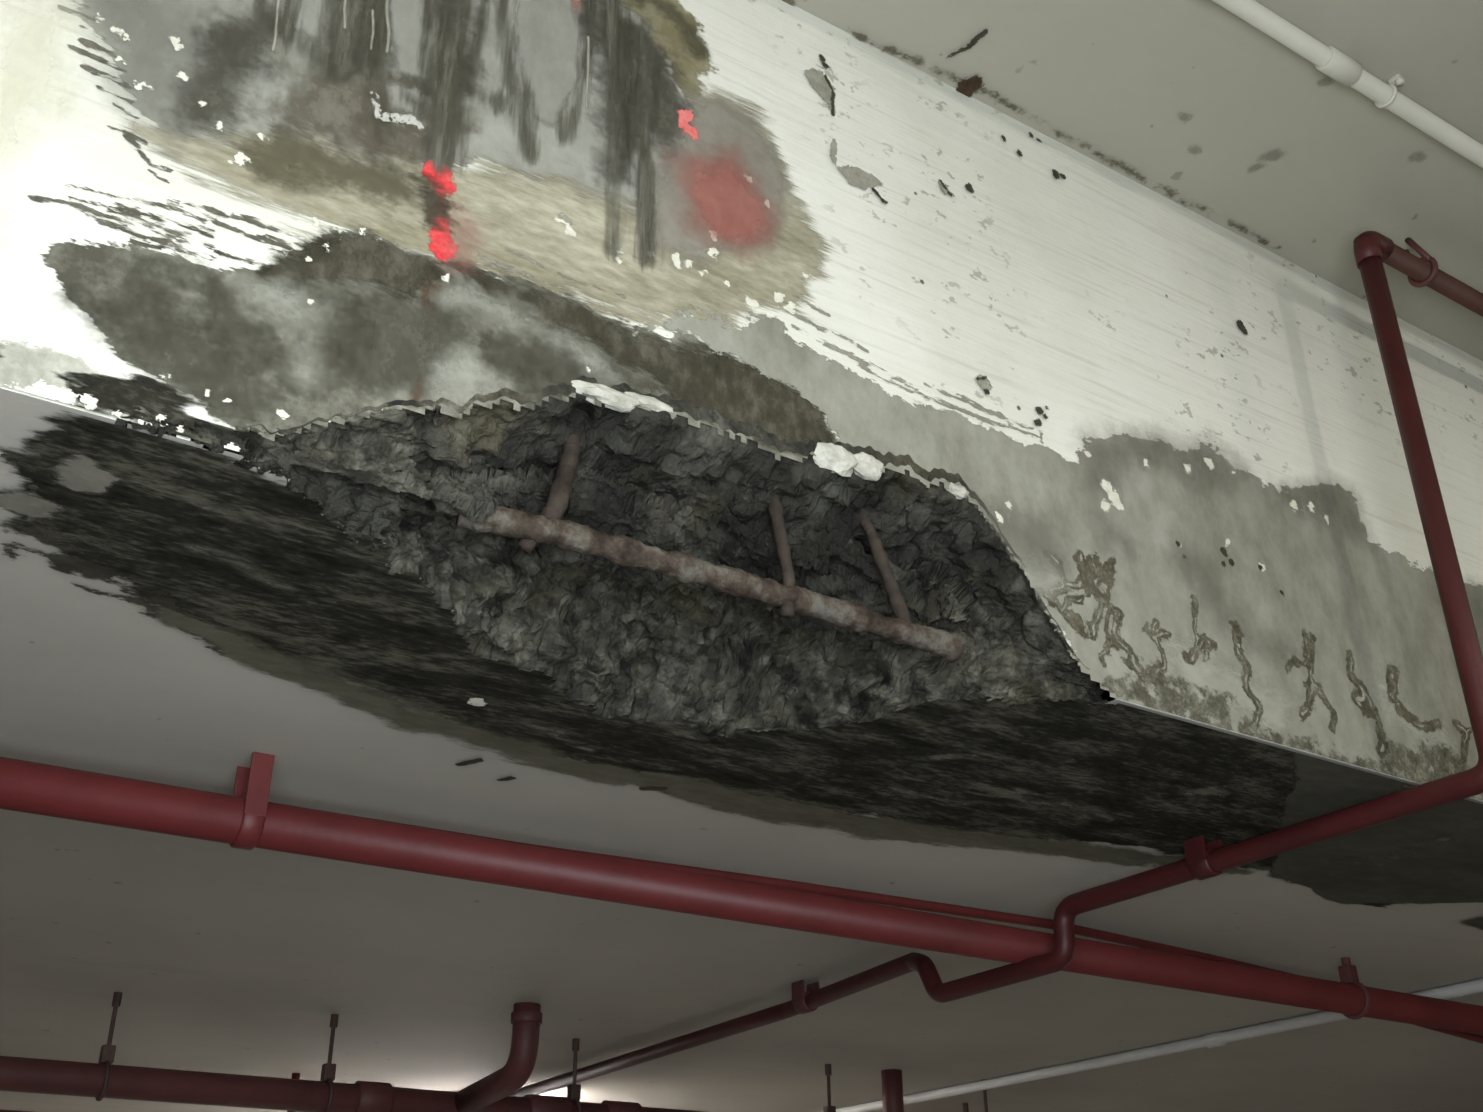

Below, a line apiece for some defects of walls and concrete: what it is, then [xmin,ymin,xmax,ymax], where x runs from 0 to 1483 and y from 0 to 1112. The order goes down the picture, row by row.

spalling [0,340,1114,739]
water stain [0,0,1478,867]
crack [1034,550,1472,762]
water stain [1464,582,1483,656]
water stain [1222,793,1483,930]